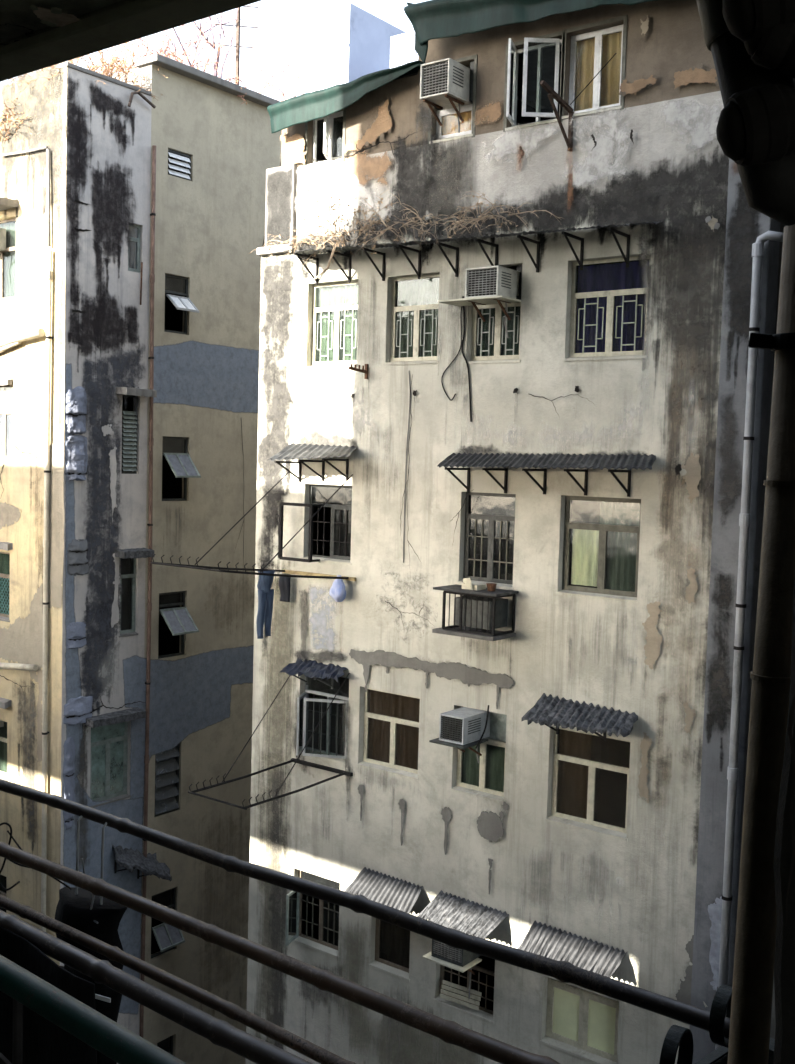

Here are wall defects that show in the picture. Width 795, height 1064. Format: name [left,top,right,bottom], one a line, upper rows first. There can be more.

peeling [280,100,392,237]
peeling [475,101,501,125]
peeling [487,126,557,160]
peeling [619,75,658,96]
peeling [661,63,720,149]
leakage [0,62,144,714]
peeling [0,499,22,529]
leakage [257,113,761,873]
peeling [642,601,663,670]
leakage [259,880,286,954]
leakage [258,964,286,1027]